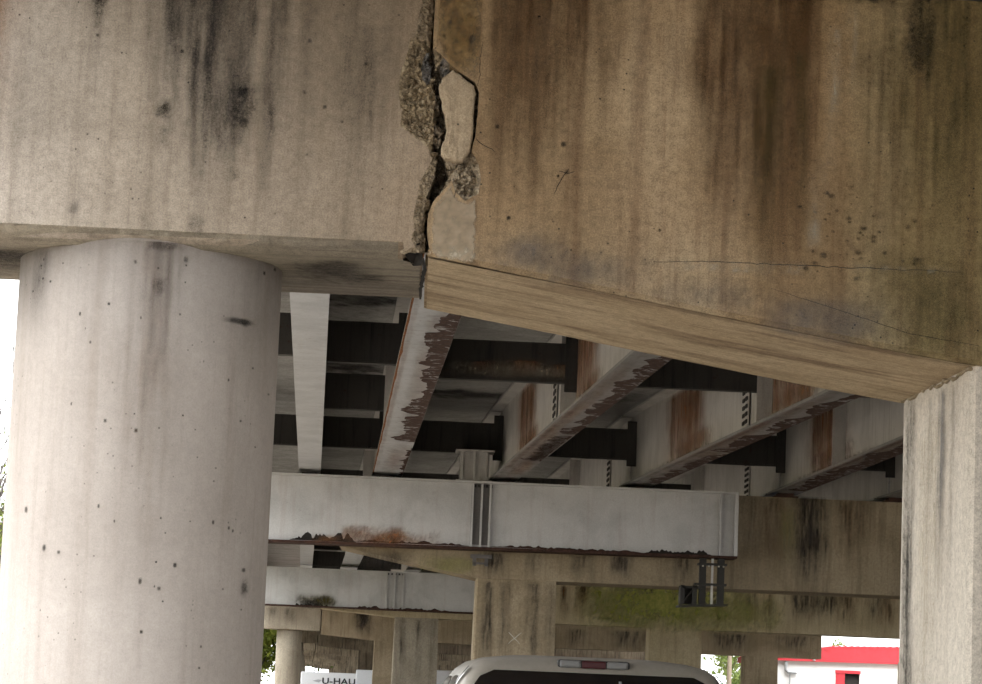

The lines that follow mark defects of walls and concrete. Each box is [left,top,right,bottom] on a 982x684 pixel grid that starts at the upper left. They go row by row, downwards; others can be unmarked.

damp [192,0,217,89]
spalling [399,38,481,201]
crack [400,0,495,299]
damp [720,9,742,165]
spalling [405,242,423,266]
crack [671,261,978,346]
corrosion [290,528,464,546]